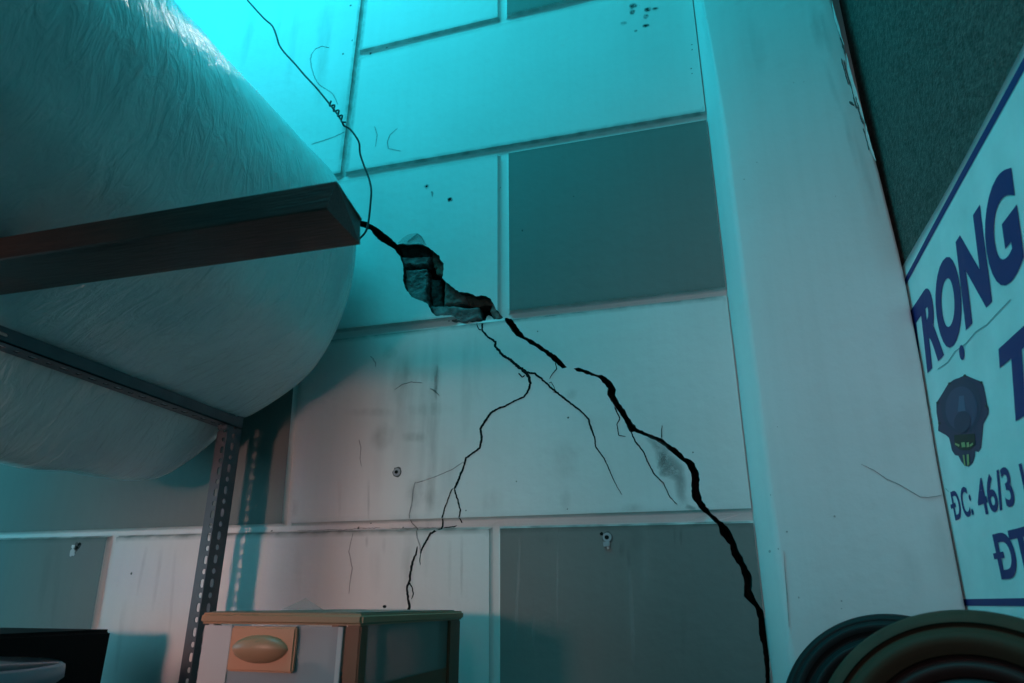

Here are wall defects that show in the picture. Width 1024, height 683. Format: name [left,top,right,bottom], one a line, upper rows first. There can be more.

flaking render [360,221,503,323]
crack [406,318,770,683]